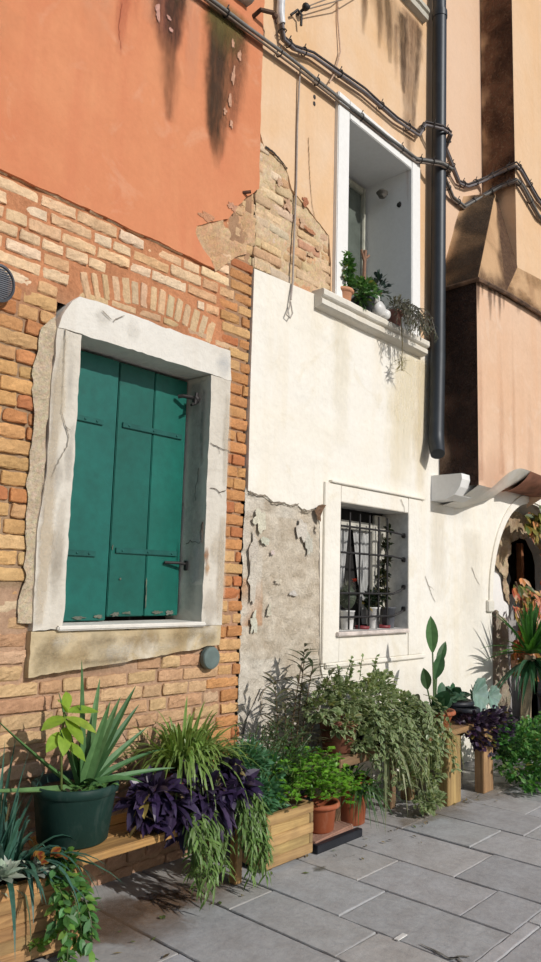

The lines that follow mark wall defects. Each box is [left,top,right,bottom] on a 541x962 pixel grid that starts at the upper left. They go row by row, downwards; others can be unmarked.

water stain [156,0,185,42]
water stain [208,6,244,143]
water stain [379,0,419,82]
flaking render [195,140,331,293]
crack [52,328,70,477]
flaking render [237,487,326,746]